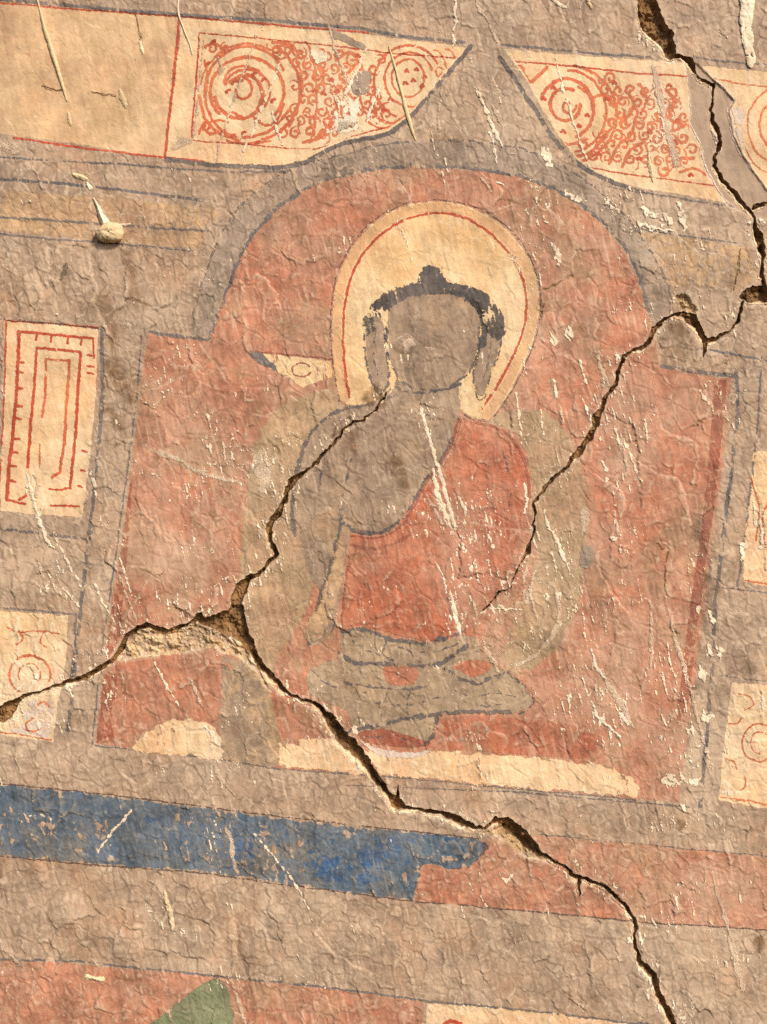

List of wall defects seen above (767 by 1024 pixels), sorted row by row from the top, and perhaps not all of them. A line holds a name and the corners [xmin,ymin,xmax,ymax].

peeling [540,146,553,167]
peeling [637,201,688,233]
crack [473,0,767,633]
spalling [117,622,273,693]
crack [0,392,676,1024]